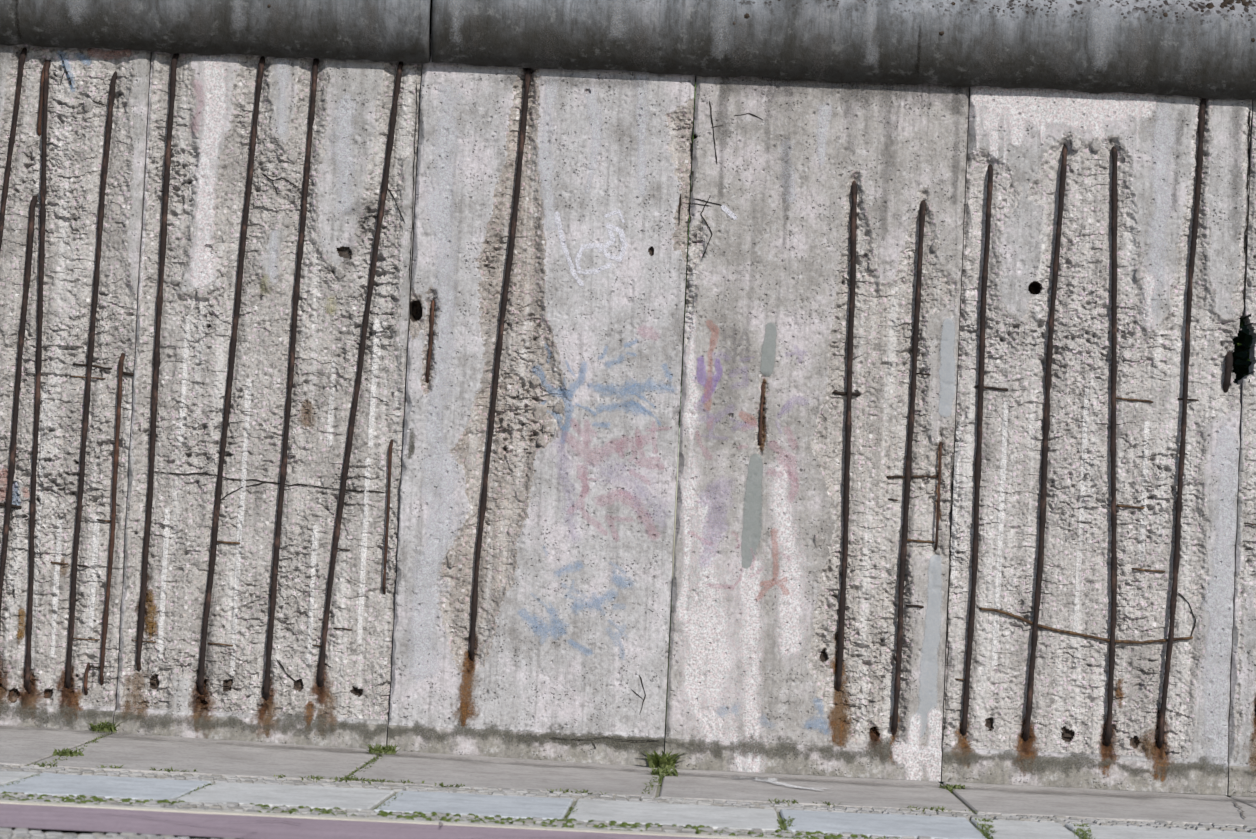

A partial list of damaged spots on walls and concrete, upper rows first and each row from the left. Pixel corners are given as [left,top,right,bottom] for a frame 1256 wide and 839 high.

spalling [0,44,442,720]
spalling [433,67,572,673]
spalling [753,372,772,458]
spalling [808,97,1256,761]
rust [0,658,42,712]
rust [58,664,82,719]
rust [304,663,336,735]
rust [453,633,478,725]
rust [830,634,851,746]
rust [870,716,902,762]
rust [1015,716,1038,772]
rust [1099,679,1123,776]